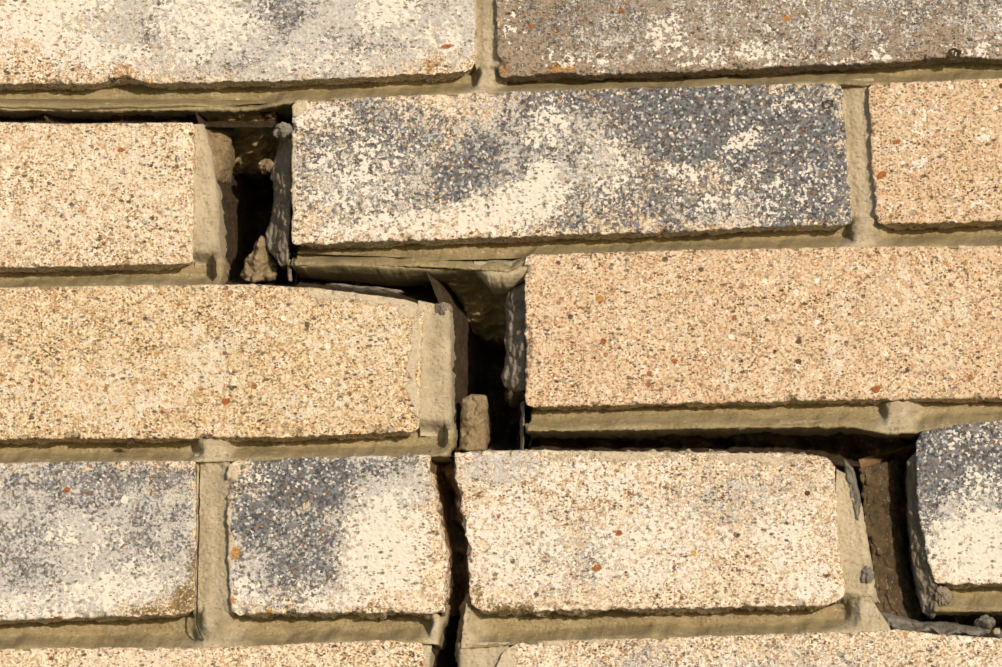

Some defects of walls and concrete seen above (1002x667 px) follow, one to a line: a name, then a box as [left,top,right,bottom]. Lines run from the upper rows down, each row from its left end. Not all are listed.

crack [0,103,293,128]
crack [213,173,916,667]
crack [922,615,1002,638]